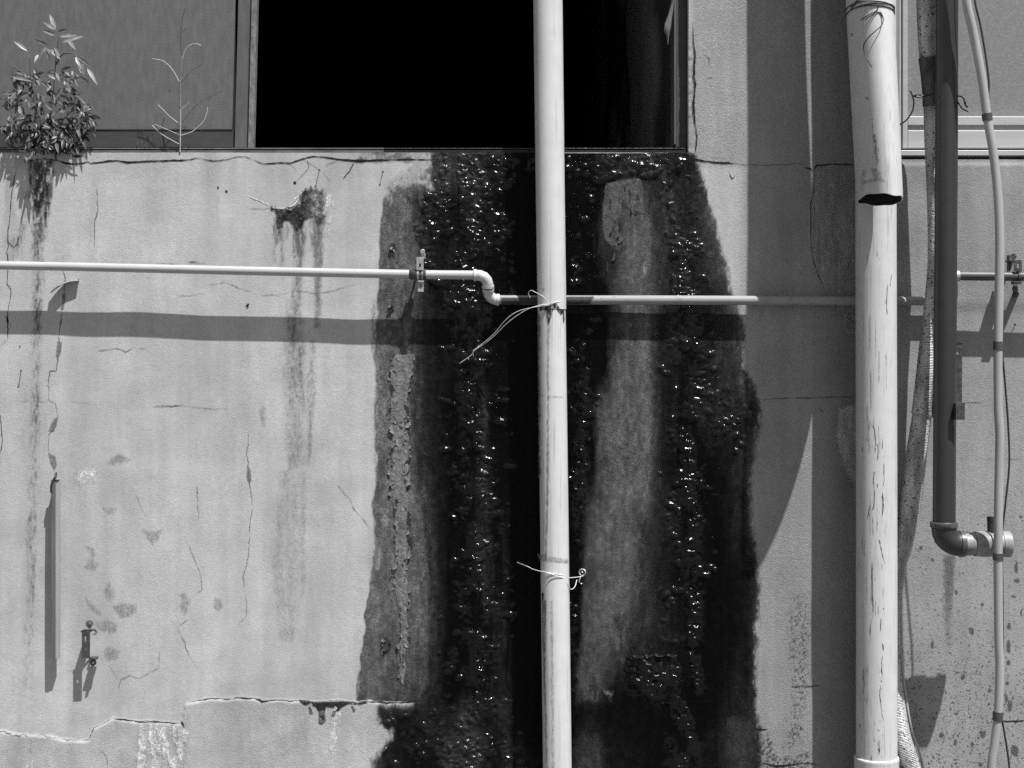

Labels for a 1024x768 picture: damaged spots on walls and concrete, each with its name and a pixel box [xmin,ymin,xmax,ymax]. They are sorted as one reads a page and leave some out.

leakage [23,159,53,251]
crack [26,272,91,469]
crack [5,155,433,342]
leakage [288,194,335,383]
peeling [381,354,415,685]
leakage [357,152,543,768]
leakage [564,152,809,768]
crack [691,29,854,292]
crack [4,697,299,765]
leakage [902,540,1024,768]